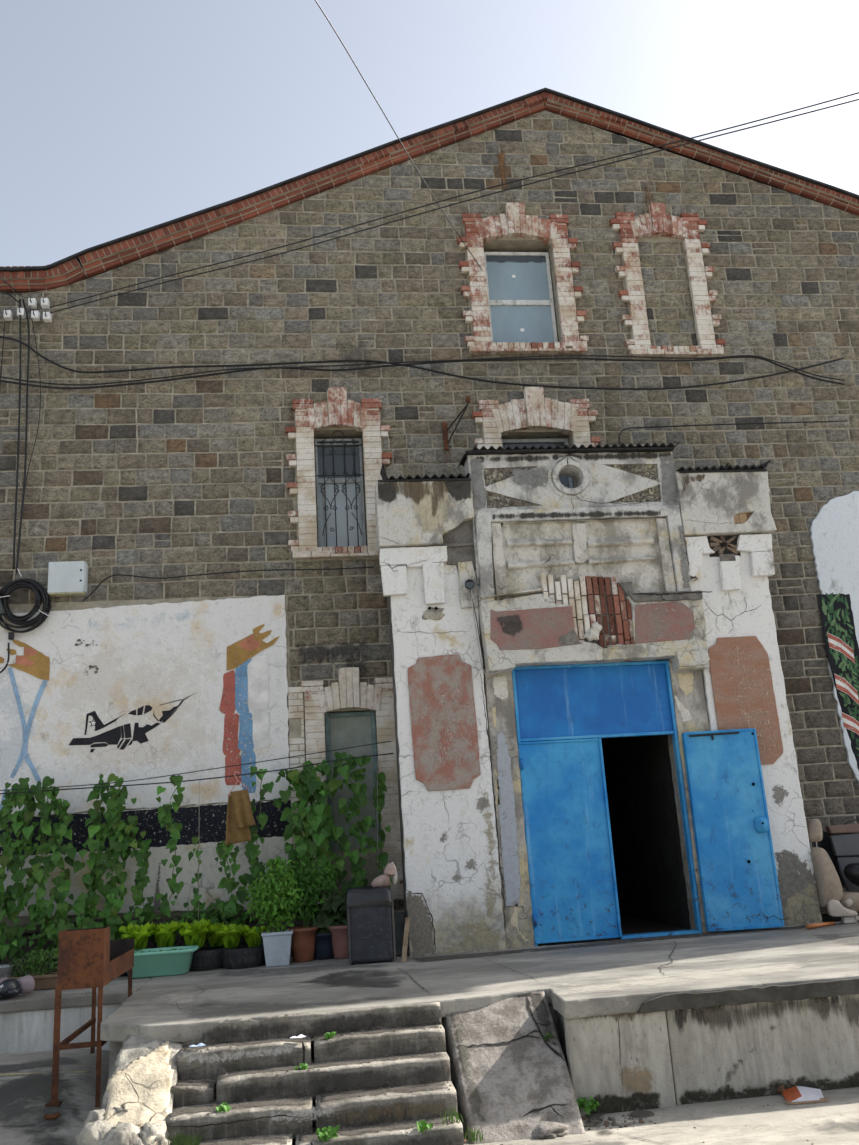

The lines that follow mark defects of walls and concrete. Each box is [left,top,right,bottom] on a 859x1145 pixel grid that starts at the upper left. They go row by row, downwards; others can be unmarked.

leakage [413,483,449,531]
crack [635,515,761,632]
flaking render [540,573,634,662]
flaking render [406,891,436,956]
flaking render [774,850,820,925]
peeling [75,1041,174,1145]
crack [523,1104,567,1118]
leakage [623,1068,652,1095]